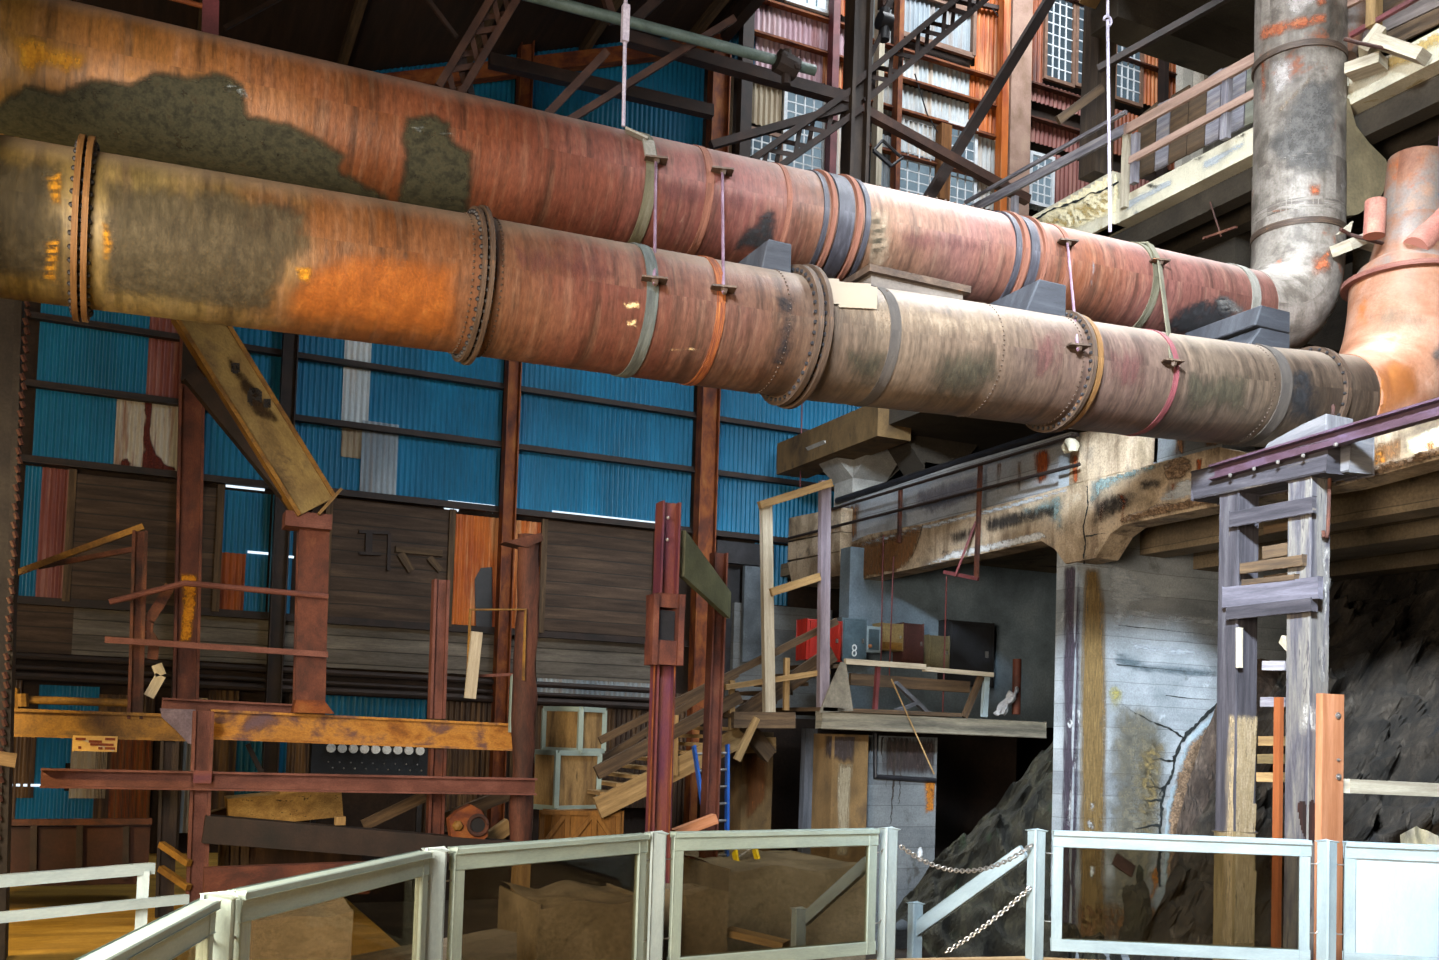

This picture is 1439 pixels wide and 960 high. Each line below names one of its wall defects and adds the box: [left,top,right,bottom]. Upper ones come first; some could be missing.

crack [1118,625,1212,636]
damp [1062,567,1218,941]
crack [1117,664,1217,887]